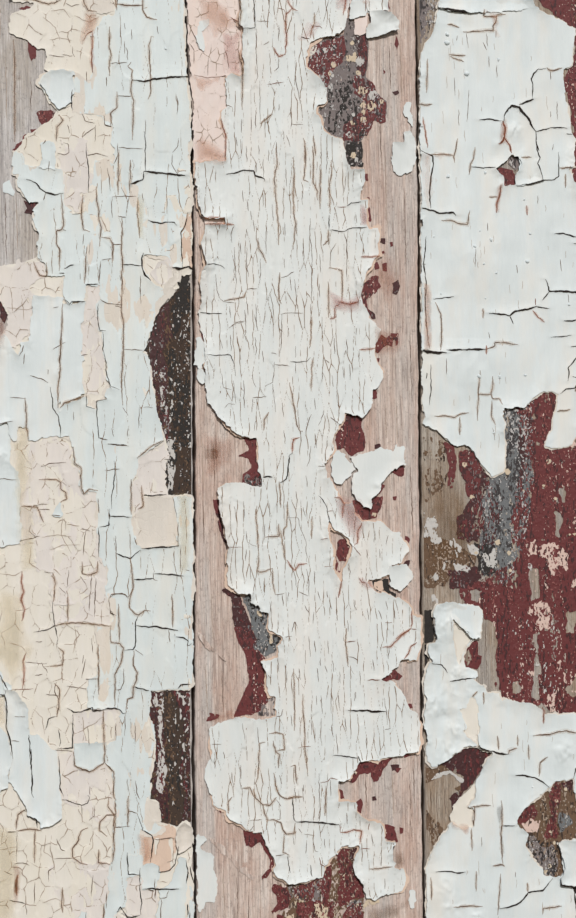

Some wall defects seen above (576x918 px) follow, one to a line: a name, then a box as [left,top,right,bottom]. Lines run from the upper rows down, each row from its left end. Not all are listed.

peeling [3,180,15,196]
crack [410,7,576,448]
peeling [159,306,206,490]
crack [0,0,446,918]
peeling [331,444,406,509]
peeling [388,564,413,591]
peeling [424,513,498,581]
crack [432,635,487,704]
peeling [153,691,190,806]
peeling [204,759,214,795]
crack [464,707,576,787]
crack [431,798,576,918]